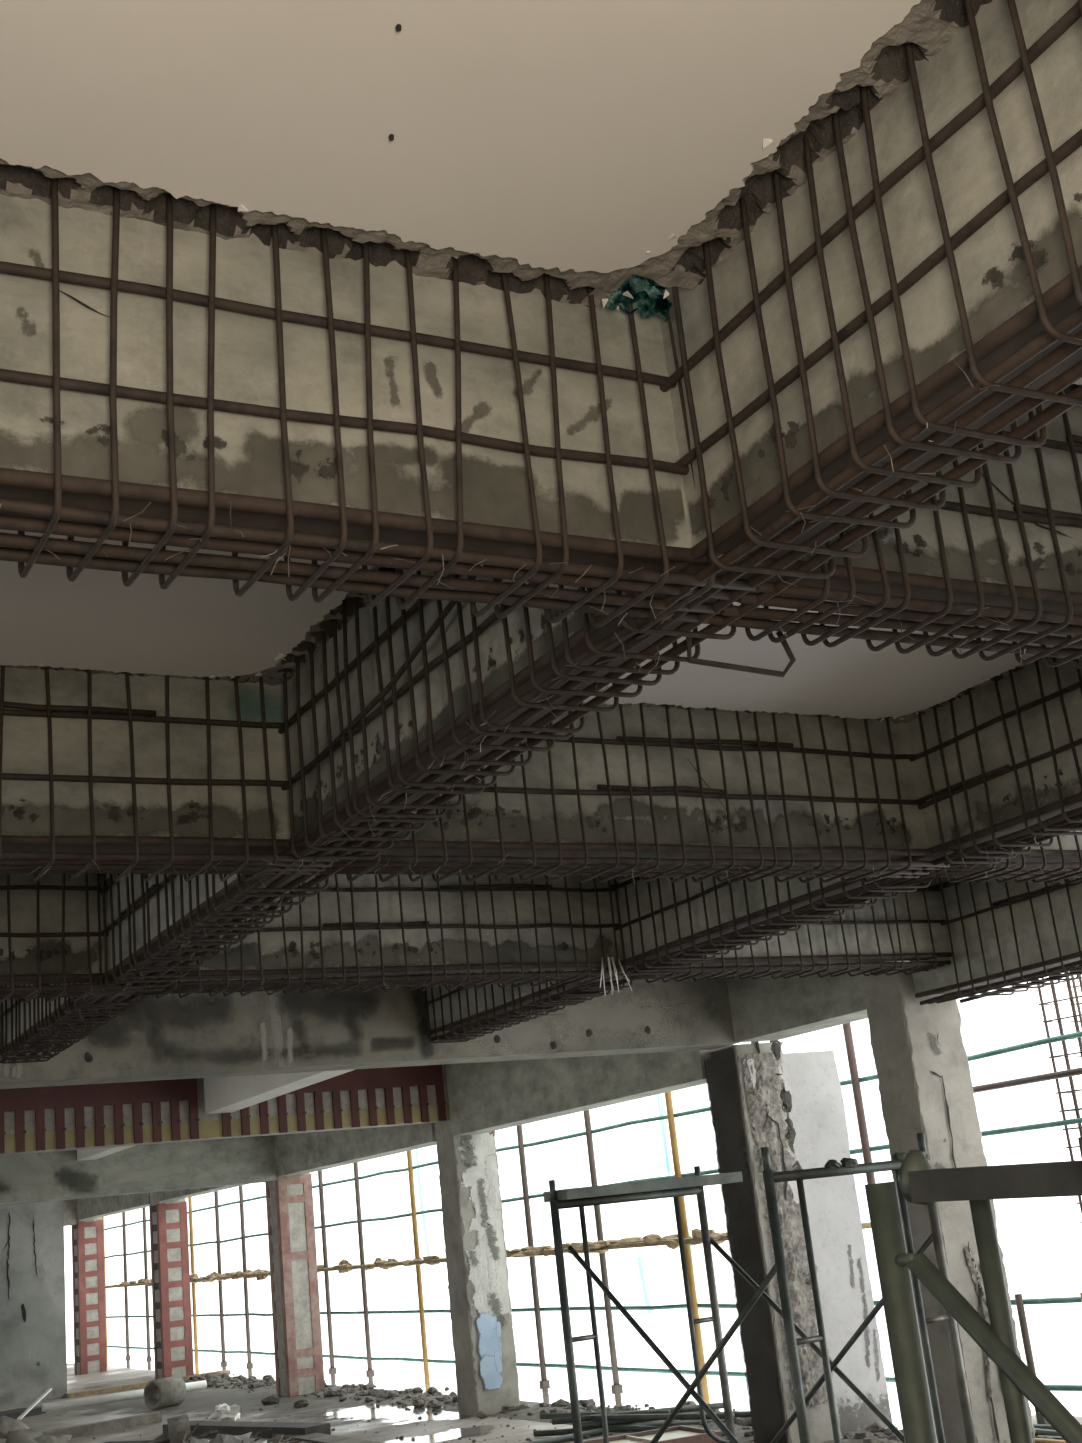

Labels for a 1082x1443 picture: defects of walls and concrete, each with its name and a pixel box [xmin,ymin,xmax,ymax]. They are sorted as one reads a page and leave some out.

peeling [0,193,1082,545]
peeling [800,518,1082,593]
flaking render [0,566,396,686]
peeling [2,610,599,839]
flaking render [618,657,1043,724]
peeling [374,796,912,848]
peeling [952,768,1082,840]
peeling [177,935,613,971]
spalling [928,1033,942,1055]
spalling [742,1040,828,1409]